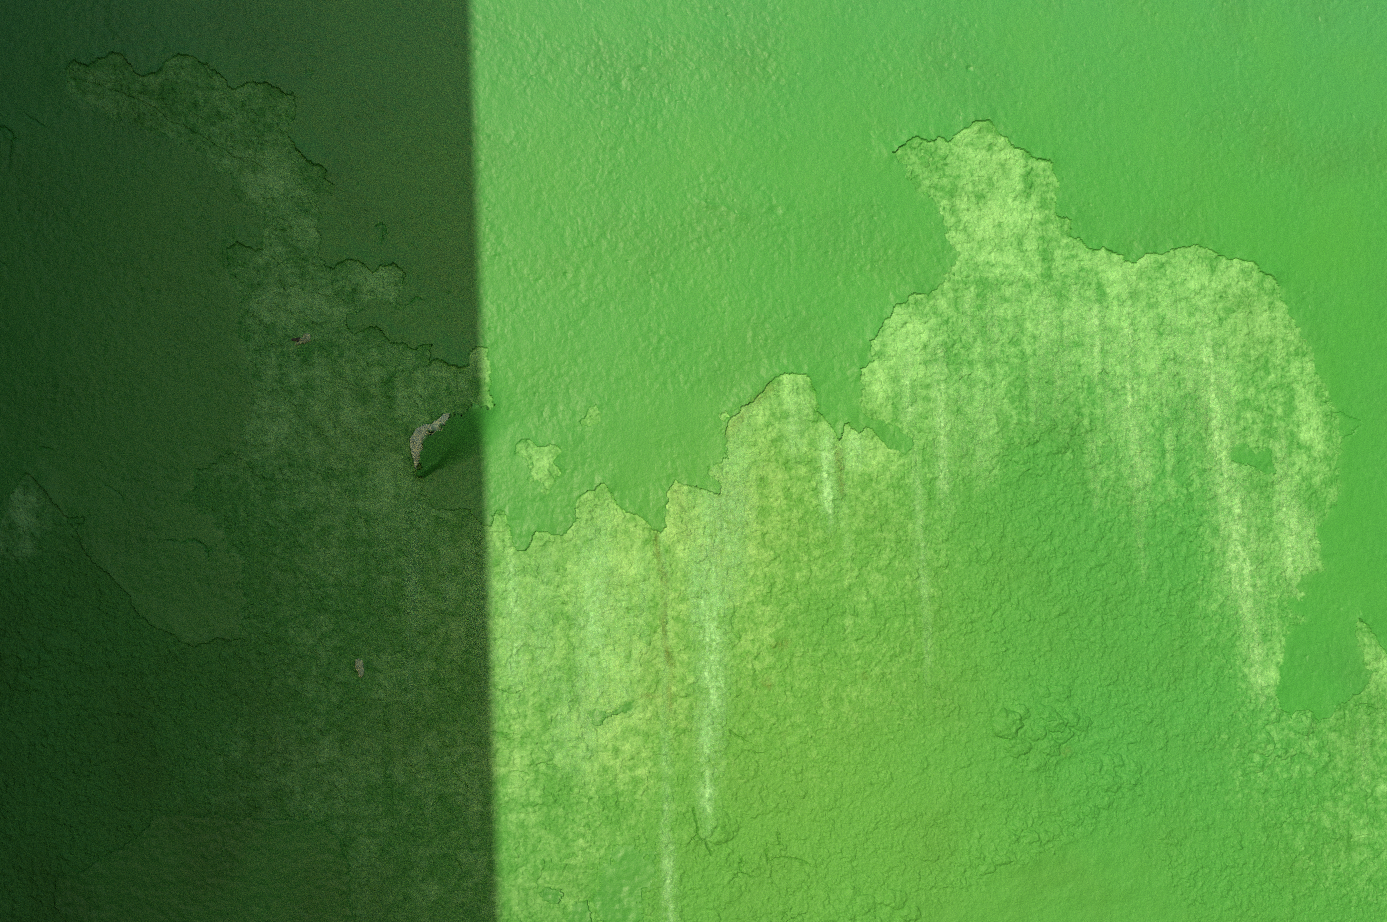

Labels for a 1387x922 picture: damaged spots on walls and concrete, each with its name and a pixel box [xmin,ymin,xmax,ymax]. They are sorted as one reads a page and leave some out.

damp [692,499,741,812]
damp [821,432,862,519]
peeling [398,116,1387,911]
damp [1087,305,1101,366]
damp [1197,314,1264,684]
damp [1281,490,1310,575]